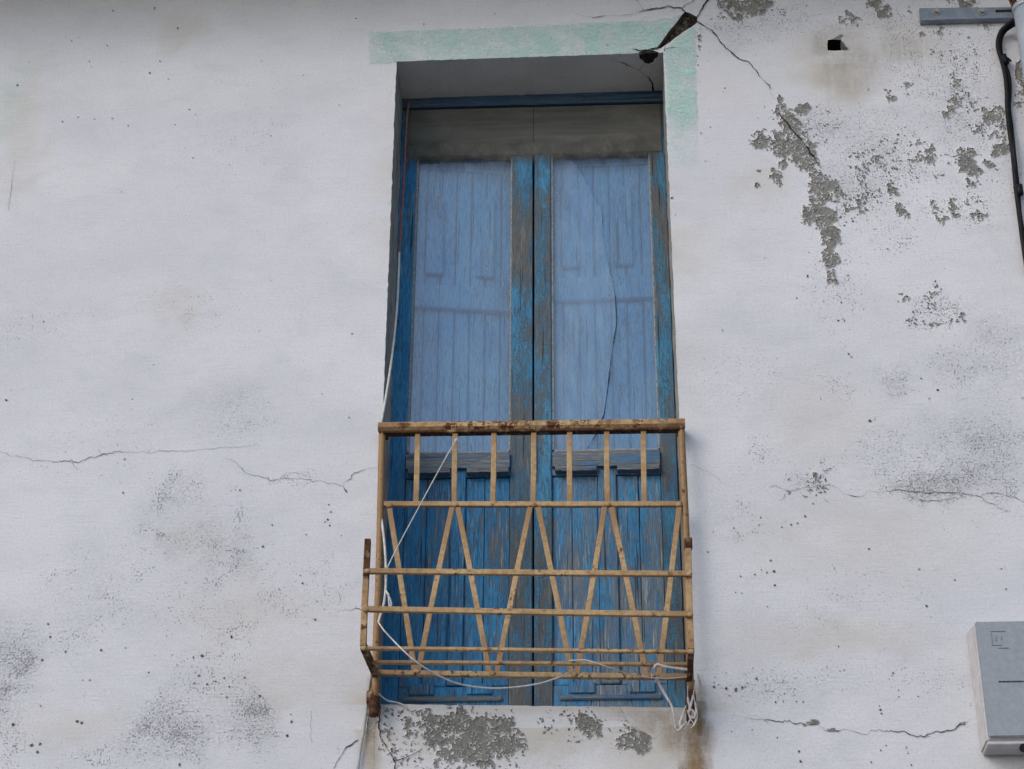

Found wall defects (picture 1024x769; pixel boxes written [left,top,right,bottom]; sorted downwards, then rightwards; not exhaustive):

crack [778,112,821,167]
peeling [627,0,1024,303]
peeling [898,280,966,329]
peeling [373,704,528,769]
peeling [537,707,652,756]
crack [747,717,968,737]